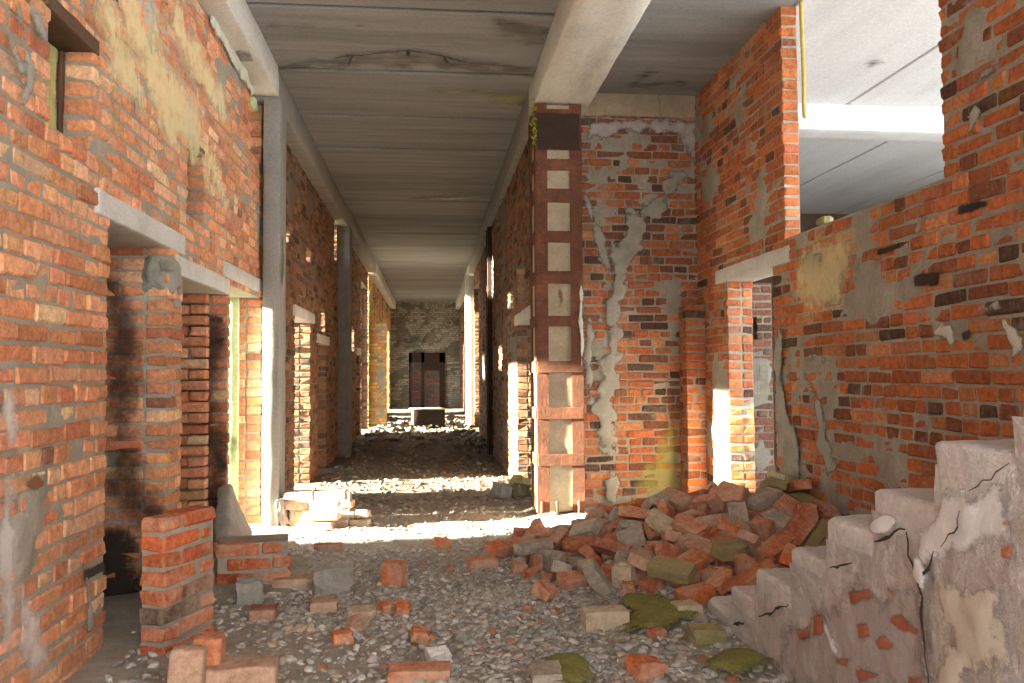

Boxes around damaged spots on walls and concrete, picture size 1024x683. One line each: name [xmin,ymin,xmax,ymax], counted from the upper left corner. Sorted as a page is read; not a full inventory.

spalling [236,50,254,62]
crack [336,50,512,67]
spalling [913,272,940,286]
leakage [4,393,17,439]
leakage [0,507,44,666]
flaking render [780,486,1012,683]
crack [874,463,1009,683]
crack [733,604,789,626]